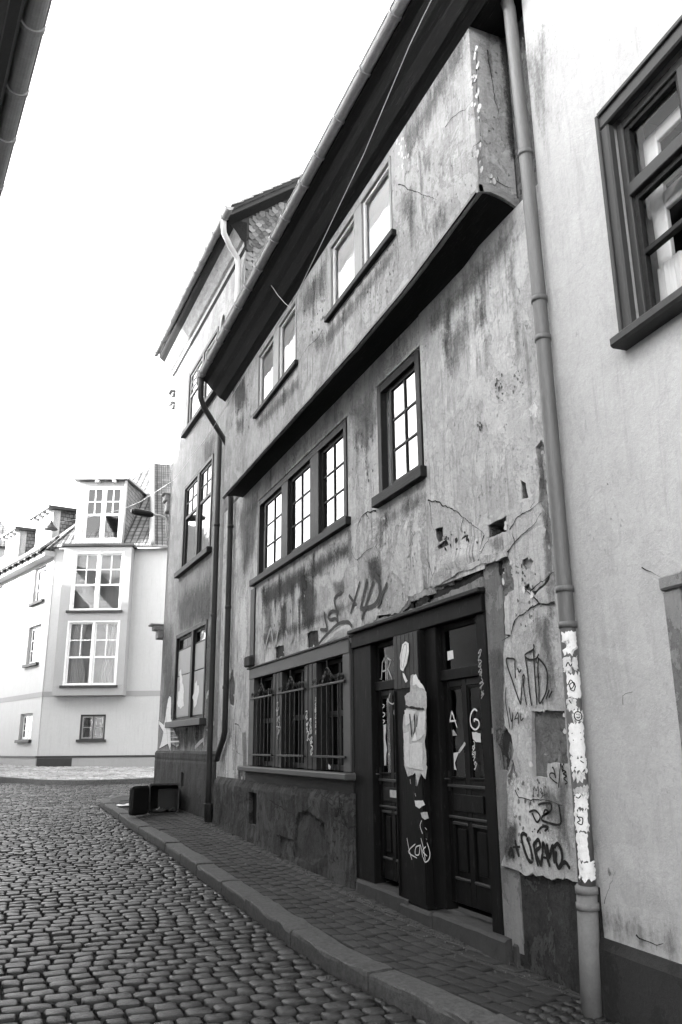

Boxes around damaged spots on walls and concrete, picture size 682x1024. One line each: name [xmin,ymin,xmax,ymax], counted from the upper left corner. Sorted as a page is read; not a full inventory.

crack [445,50,510,188]
water stain [499,37,515,158]
flaking render [436,531,489,557]
crack [409,499,542,589]
water stain [262,545,348,633]
water stain [317,620,352,646]
flaking render [502,555,550,627]
crack [502,572,555,641]